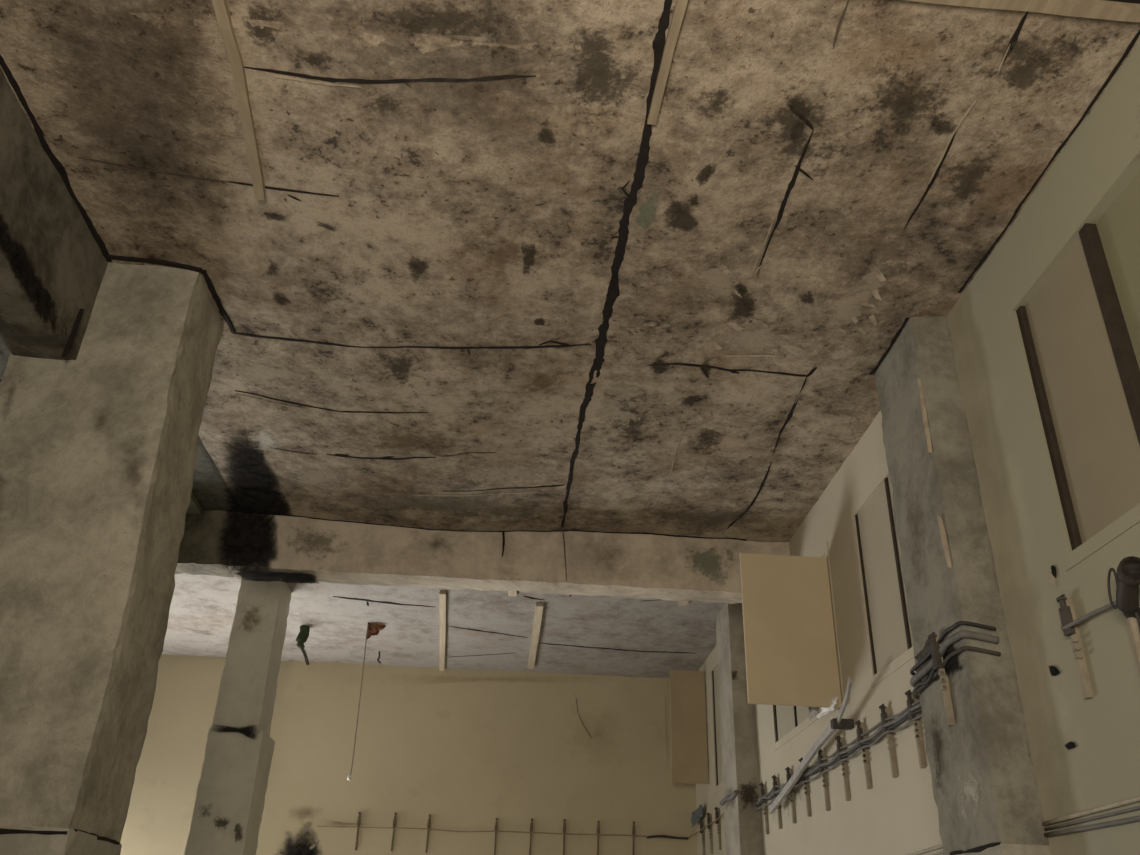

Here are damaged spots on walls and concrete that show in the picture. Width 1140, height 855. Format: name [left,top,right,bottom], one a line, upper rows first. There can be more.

crack [833,0,849,49]
crack [904,100,977,230]
crack [958,0,1140,293]
crack [0,0,817,597]
crack [869,318,909,375]
leakage [252,429,278,449]
crack [0,828,121,845]